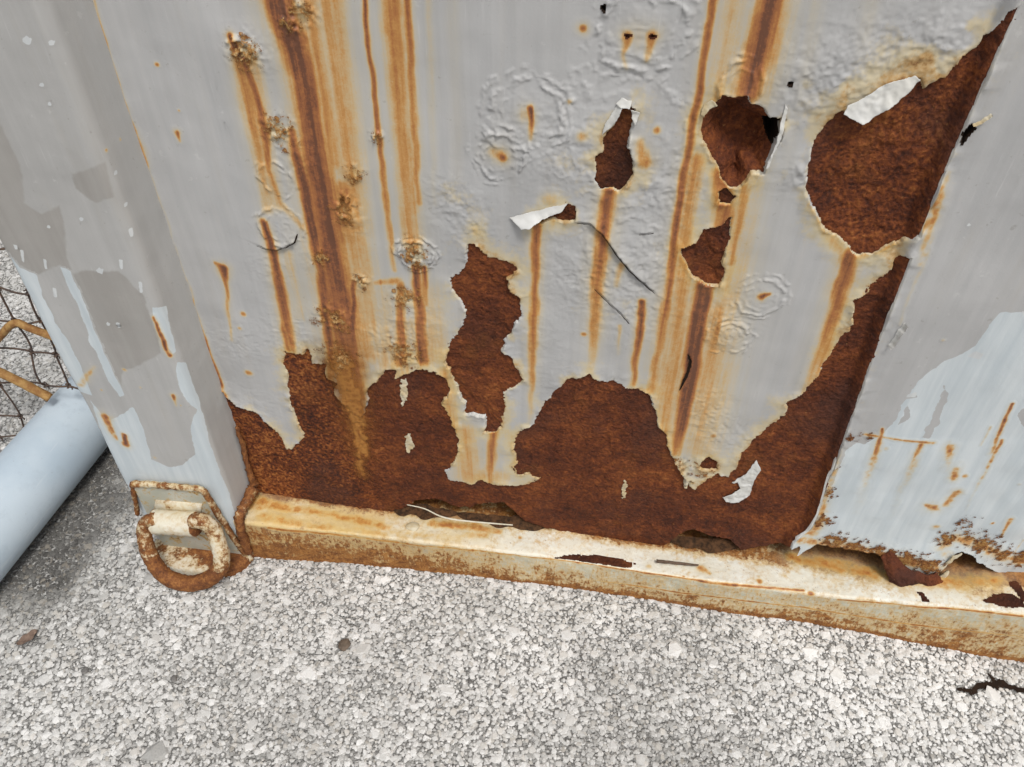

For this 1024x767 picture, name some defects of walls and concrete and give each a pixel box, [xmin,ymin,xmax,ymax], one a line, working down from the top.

peeling [510,203,568,230]
crack [576,223,655,294]
rust [93,0,1024,620]
rust [76,360,138,453]
peeling [832,310,1024,550]